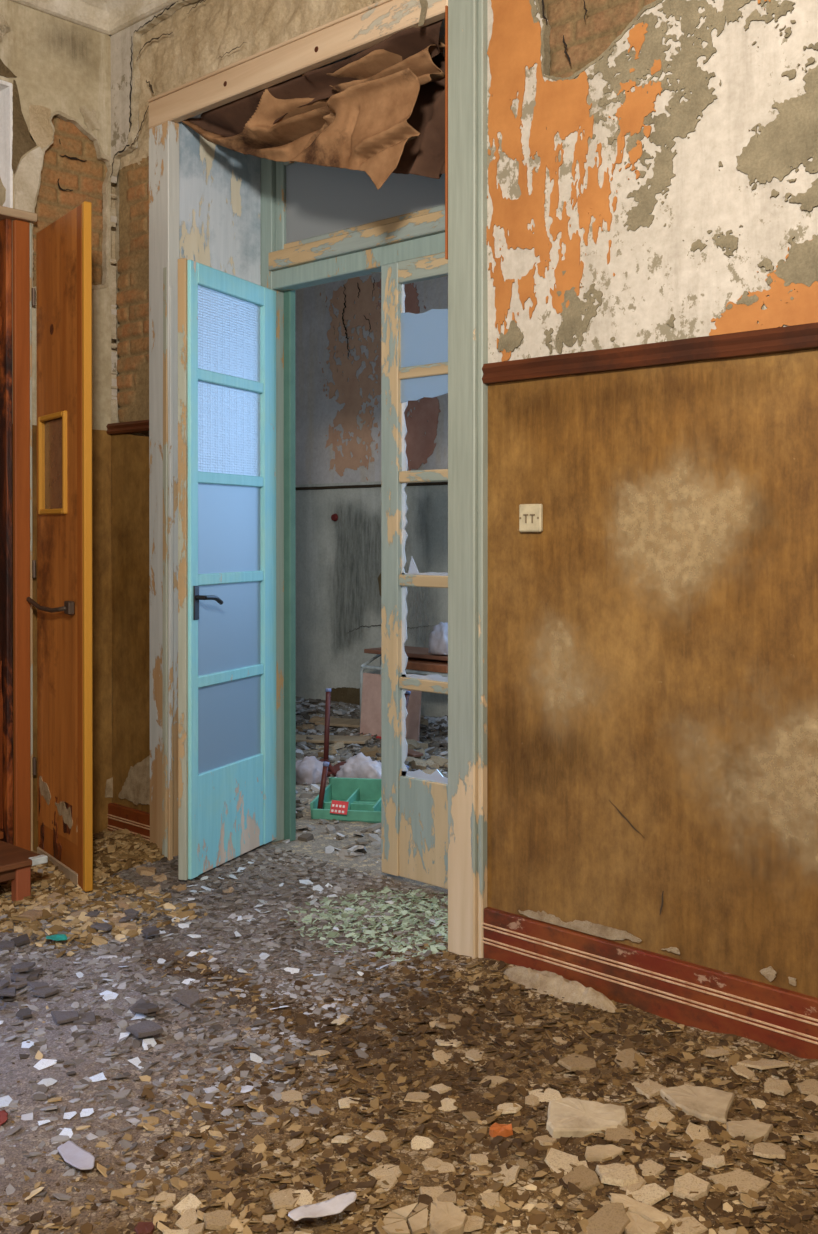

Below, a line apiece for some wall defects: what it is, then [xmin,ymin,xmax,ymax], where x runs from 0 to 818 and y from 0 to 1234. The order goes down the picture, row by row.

spalling [0,0,373,423]
peeling [319,275,381,481]
peeling [404,283,427,314]
peeling [404,397,441,471]
peeling [486,0,796,362]
peeling [709,234,818,336]
peeling [718,42,818,212]
peeling [518,910,642,943]